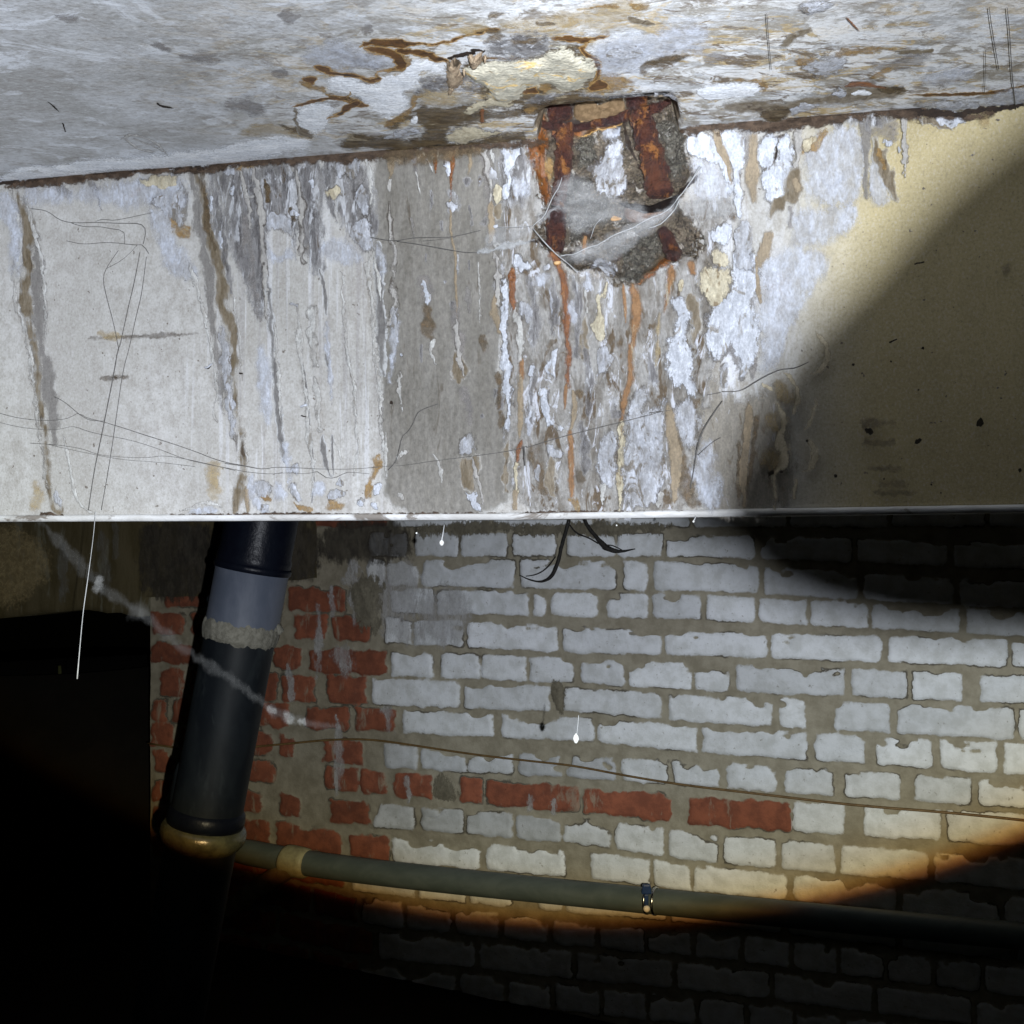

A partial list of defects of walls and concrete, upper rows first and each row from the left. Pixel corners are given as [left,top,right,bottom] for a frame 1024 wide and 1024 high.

rust [293,28,504,137]
water stain [488,16,564,61]
rust [522,84,552,94]
spalling [461,40,706,287]
rust [551,35,632,94]
water stain [0,41,1024,602]
rust [508,267,524,510]
rust [541,99,696,511]